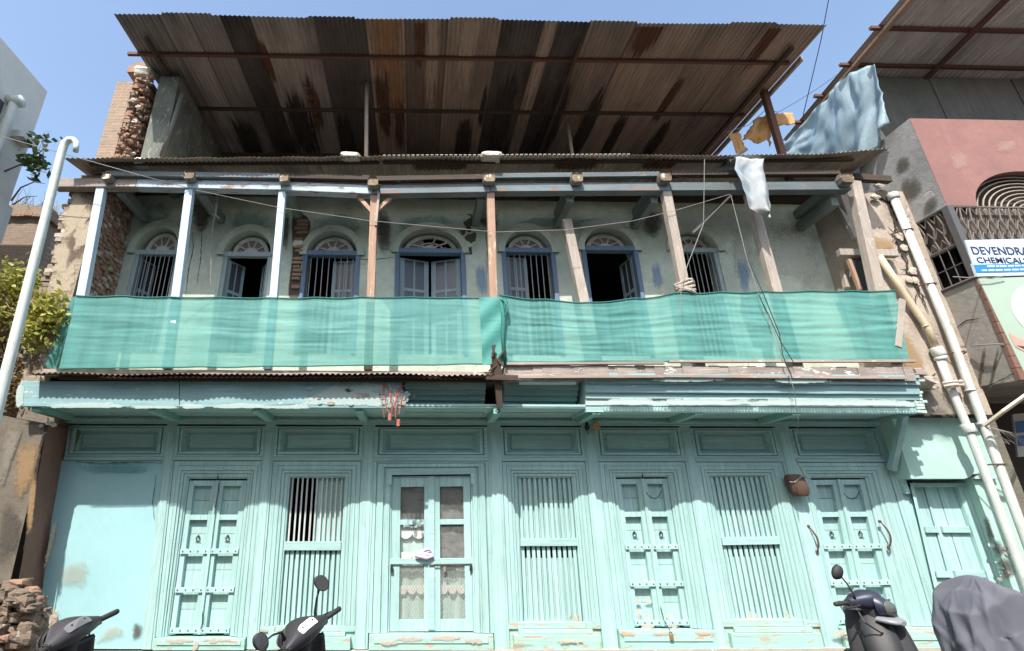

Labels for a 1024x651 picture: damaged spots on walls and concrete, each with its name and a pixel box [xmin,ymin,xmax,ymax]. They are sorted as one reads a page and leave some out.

corrosion [414,23,425,67]
corrosion [627,26,664,59]
corrosion [742,28,781,73]
corrosion [370,19,405,147]
corrosion [652,78,686,121]
spalling [28,192,73,322]
crack [186,229,202,291]
peeling [608,397,918,406]
peeling [14,444,38,529]
peeling [381,634,482,646]